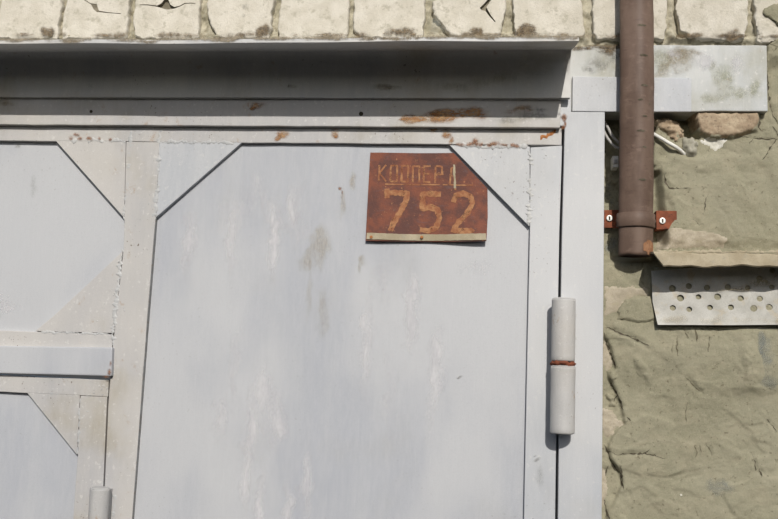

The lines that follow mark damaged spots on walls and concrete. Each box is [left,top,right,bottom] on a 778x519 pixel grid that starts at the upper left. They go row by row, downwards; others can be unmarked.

crack [85,0,121,14]
crack [140,0,195,10]
crack [480,0,496,22]
rust [402,108,518,147]
spalling [654,118,684,142]
crack [741,74,778,160]
crack [604,327,649,421]
crack [604,445,665,489]